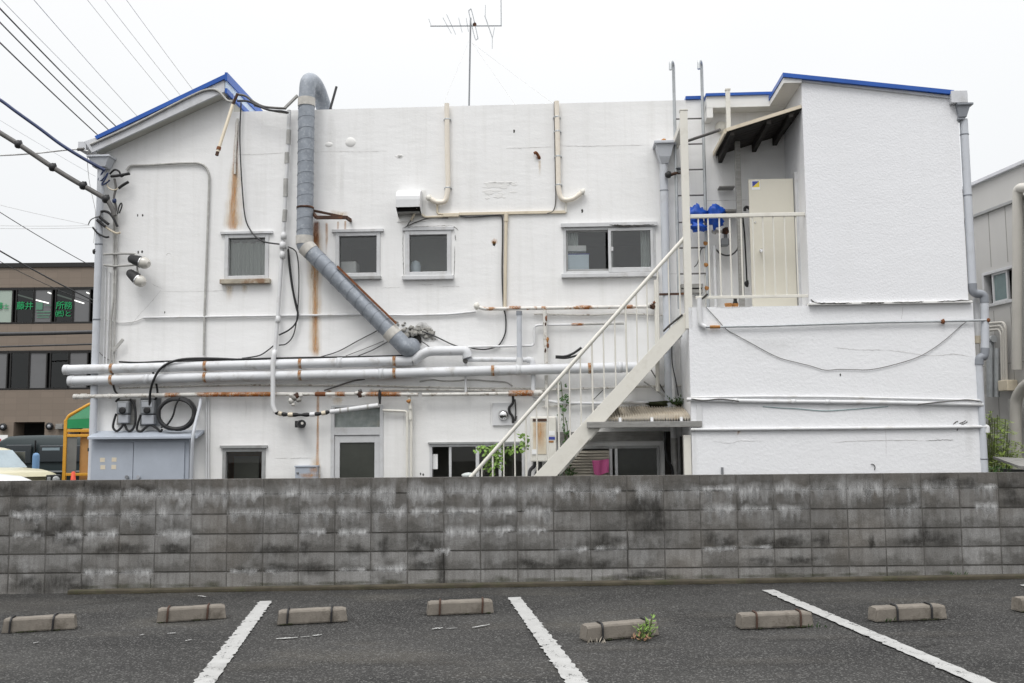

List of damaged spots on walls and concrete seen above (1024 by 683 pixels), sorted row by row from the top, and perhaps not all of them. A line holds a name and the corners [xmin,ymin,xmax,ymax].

corrosion [231,118,239,224]
damp [359,487,515,516]